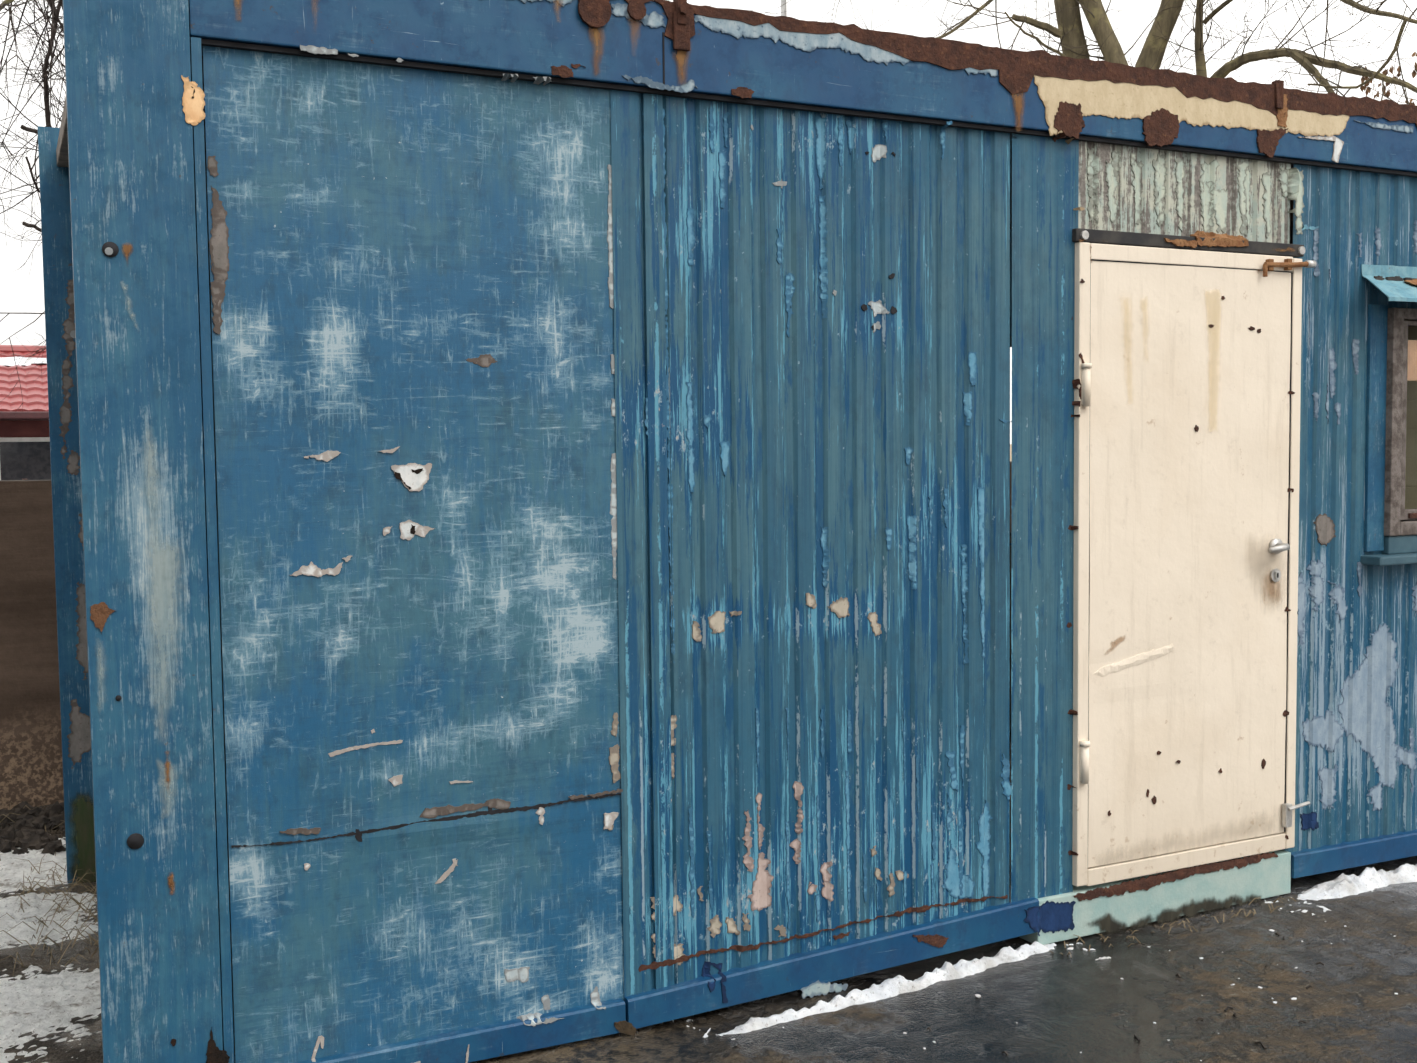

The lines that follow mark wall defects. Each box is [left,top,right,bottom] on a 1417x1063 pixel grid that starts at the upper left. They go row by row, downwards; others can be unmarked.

rust [551,27,602,78]
spalling [181,75,206,126]
rust [608,0,1417,158]
rust [1164,230,1249,248]
spalling [380,446,432,491]
spalling [383,520,434,540]
spalling [291,556,352,577]
peeling [1302,623,1417,811]
damp [70,794,96,884]
peeling [673,771,909,938]
rust [1073,852,1278,901]
rust [638,895,1008,972]